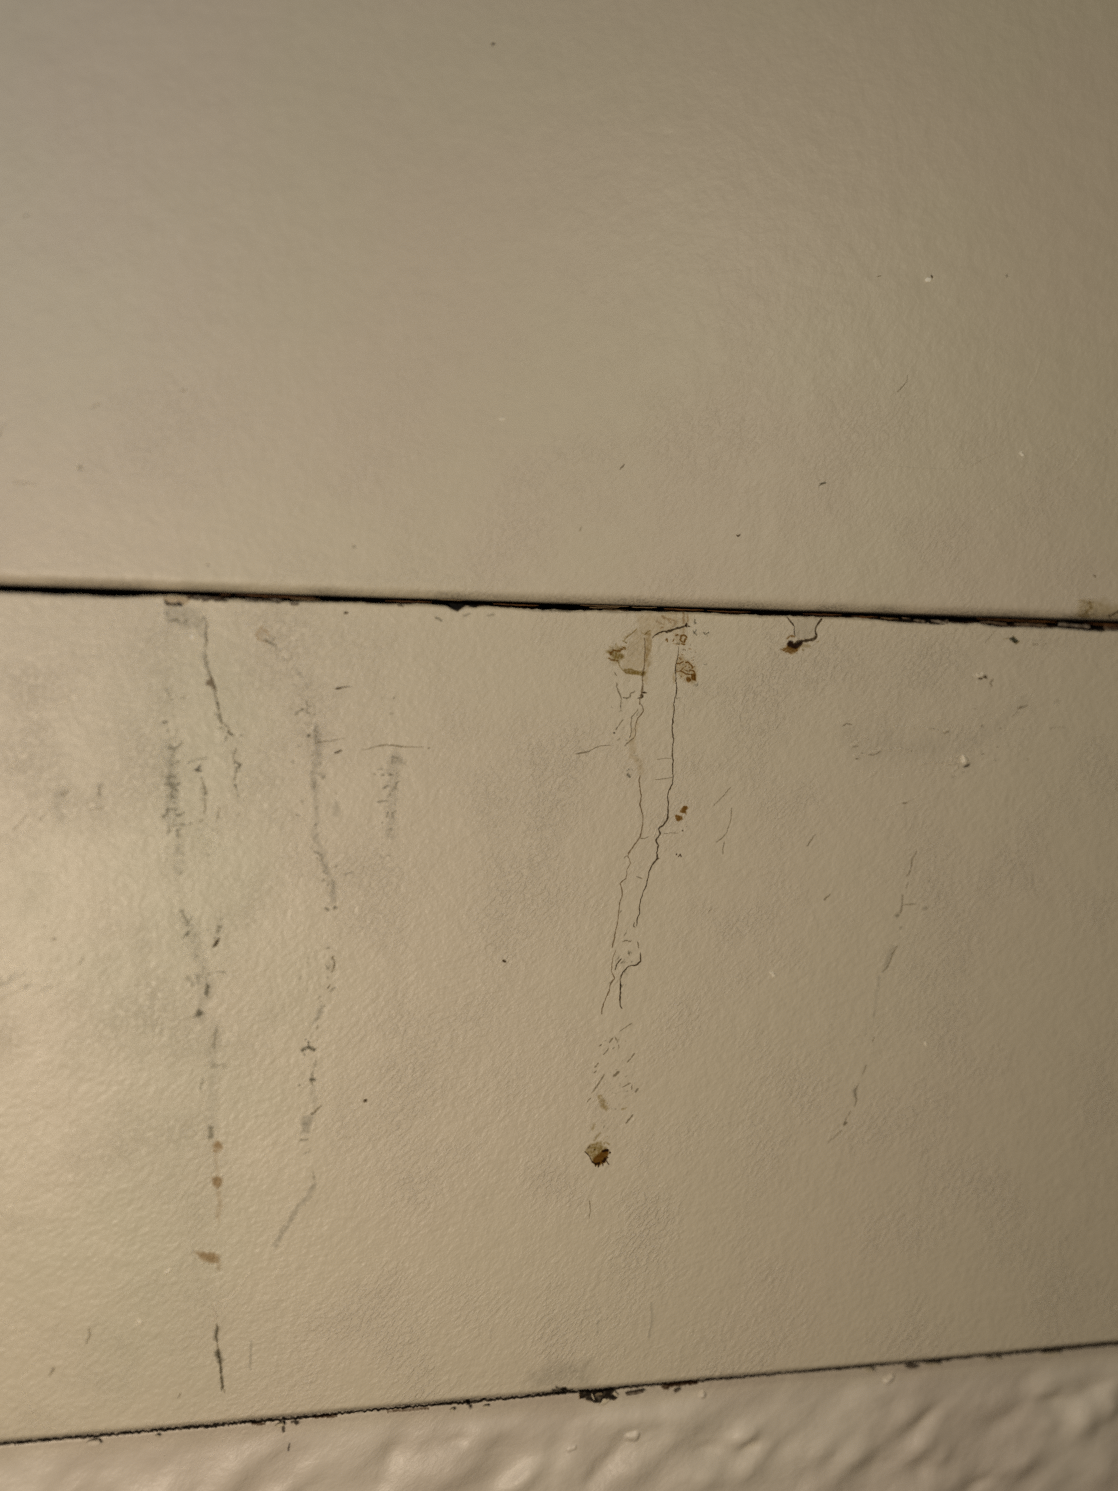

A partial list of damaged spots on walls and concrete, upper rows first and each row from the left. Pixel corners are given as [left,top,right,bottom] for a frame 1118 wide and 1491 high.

crack [601,623,690,1014]
rust [585,1144,611,1167]